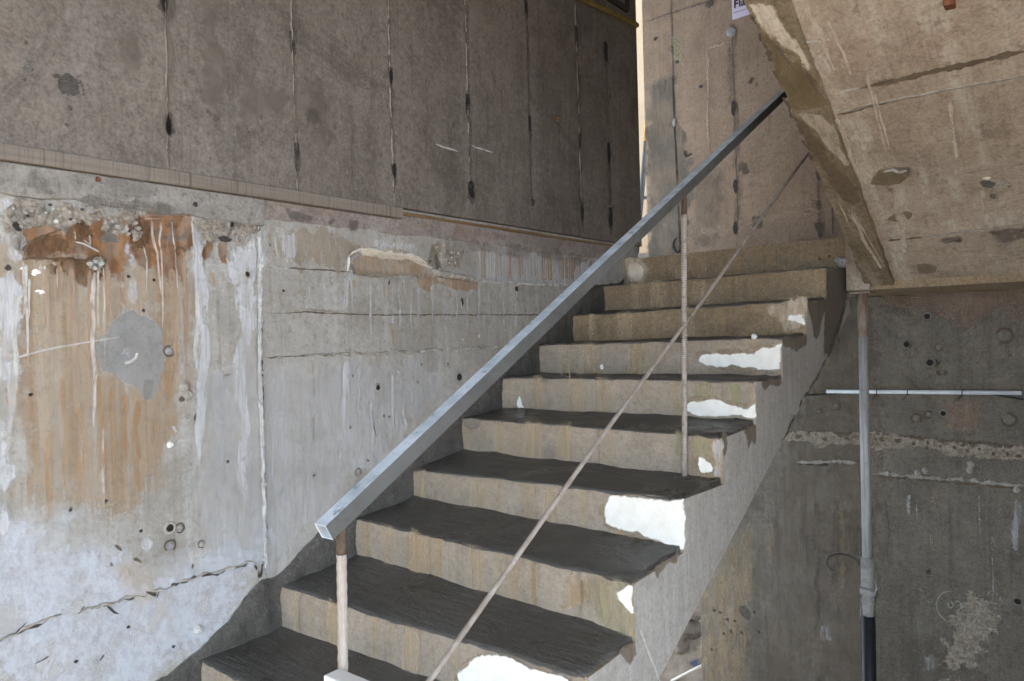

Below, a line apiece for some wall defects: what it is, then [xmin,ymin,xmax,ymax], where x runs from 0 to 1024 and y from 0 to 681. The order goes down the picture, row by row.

damp [0,421,17,492]
damp [0,234,31,384]
spalling [3,196,143,276]
rust [5,210,229,524]
crack [0,227,269,642]
damp [81,194,209,369]
spalling [193,202,261,245]
damp [222,237,257,329]
spalling [424,241,464,271]
spalling [781,302,1024,460]